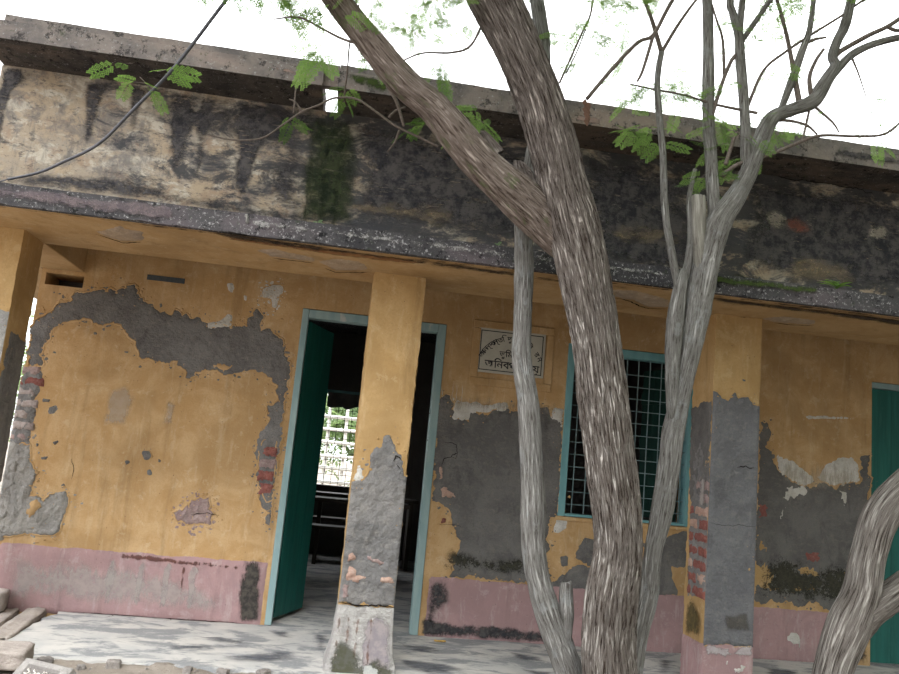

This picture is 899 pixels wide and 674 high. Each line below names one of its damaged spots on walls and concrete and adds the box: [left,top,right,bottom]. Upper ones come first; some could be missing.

damp [0,69,25,131]
damp [25,176,170,198]
damp [166,94,310,202]
damp [589,163,687,268]
peeling [0,276,295,544]
peeling [338,435,407,608]
peeling [426,390,527,585]
peeling [540,399,594,589]
peeling [659,387,873,648]
damp [239,561,260,620]
damp [422,583,543,641]
damp [762,560,846,601]